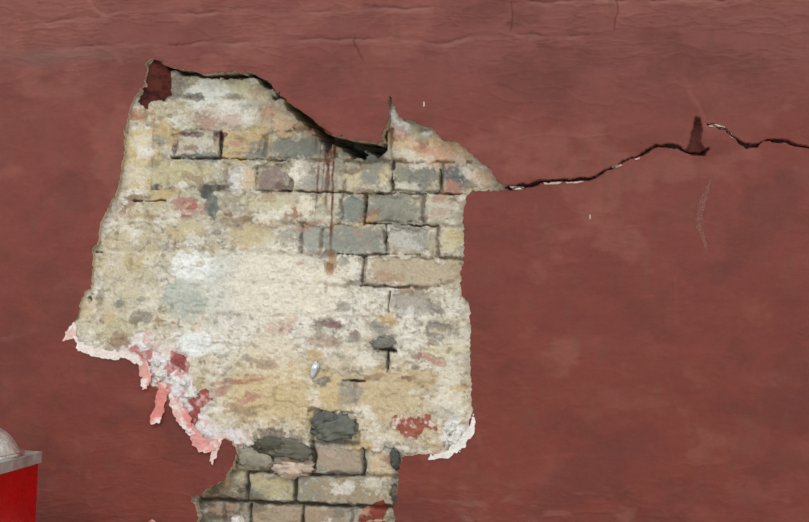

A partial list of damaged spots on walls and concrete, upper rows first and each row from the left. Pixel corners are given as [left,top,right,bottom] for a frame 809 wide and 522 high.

crack [707,123,809,149]
crack [505,144,709,190]
spalling [62,59,508,522]